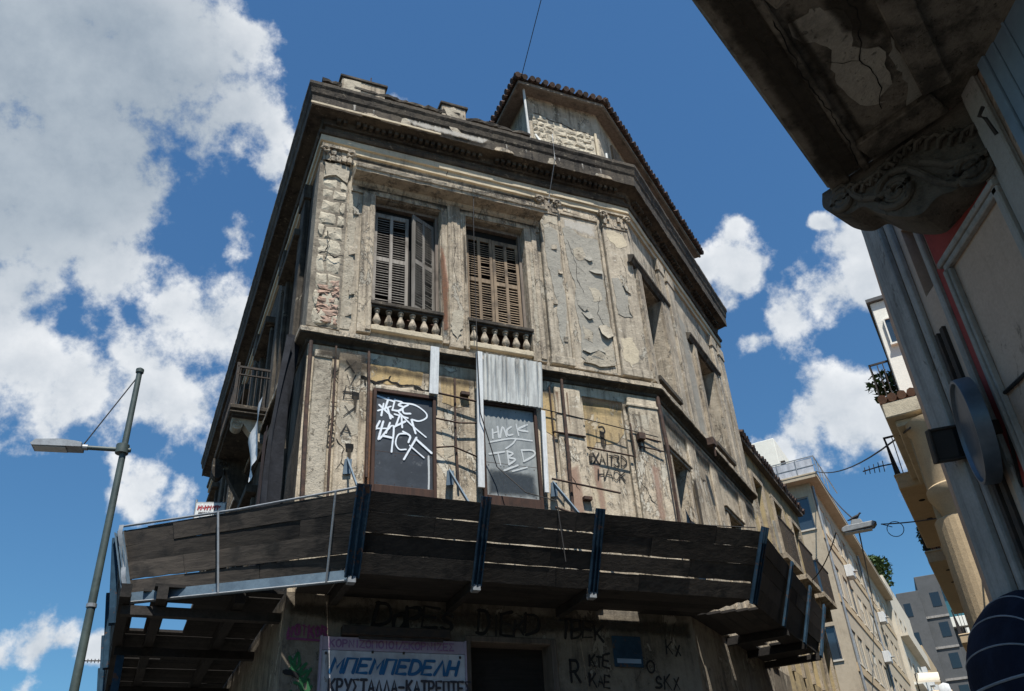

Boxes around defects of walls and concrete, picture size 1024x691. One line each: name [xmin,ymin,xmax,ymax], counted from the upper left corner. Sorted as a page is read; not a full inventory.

crack [826,0,882,109]
spalling [788,7,922,106]
flaking render [316,162,359,330]
peeling [543,207,640,367]
crack [361,375,439,392]